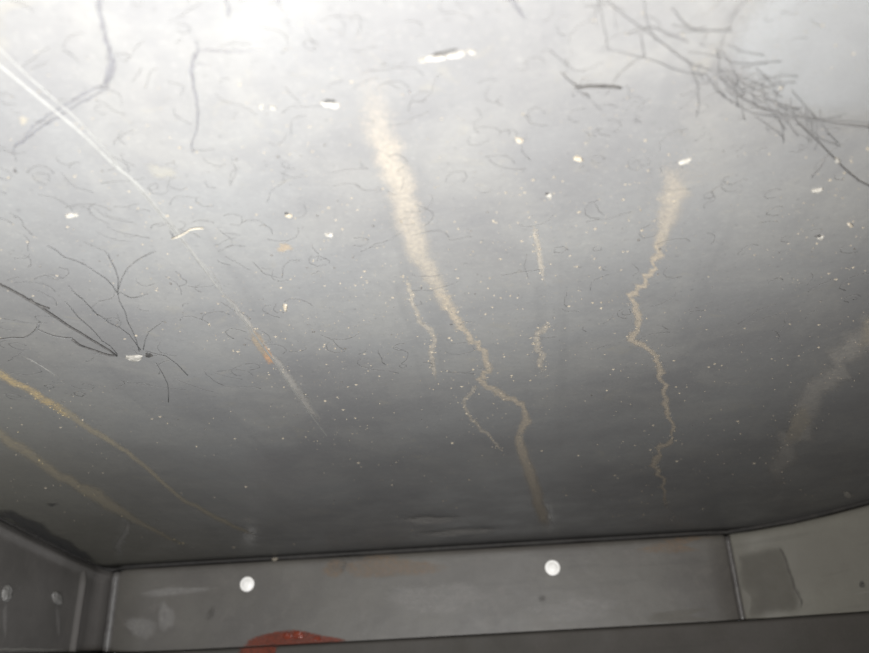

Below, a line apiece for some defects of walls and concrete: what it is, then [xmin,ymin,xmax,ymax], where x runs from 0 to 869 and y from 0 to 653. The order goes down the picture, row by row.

crack [13,0,116,152]
crack [189,40,258,150]
leakage [348,55,551,535]
leakage [623,146,700,512]